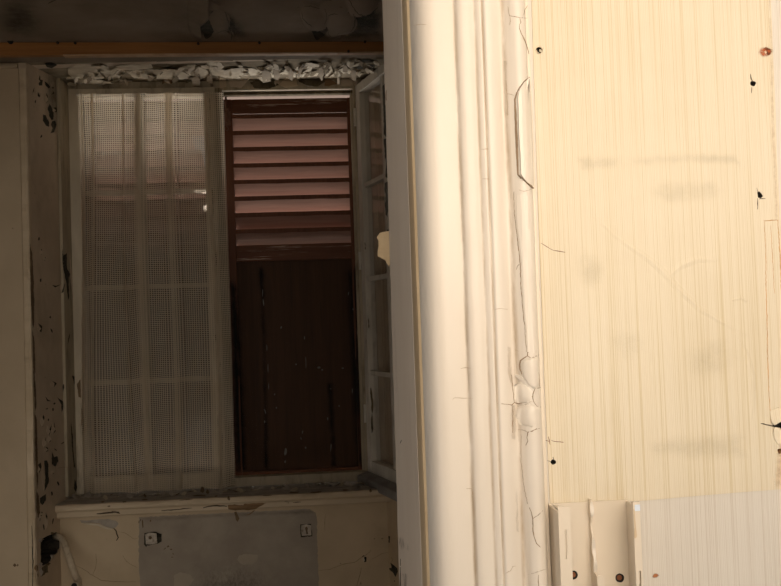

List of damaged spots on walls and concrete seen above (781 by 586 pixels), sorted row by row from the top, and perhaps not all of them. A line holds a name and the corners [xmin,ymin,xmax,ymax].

crack [508,7,529,54]
peeling [32,59,379,138]
peeling [53,245,73,299]
crack [501,210,541,444]
peeling [30,237,64,577]
crack [521,463,540,547]